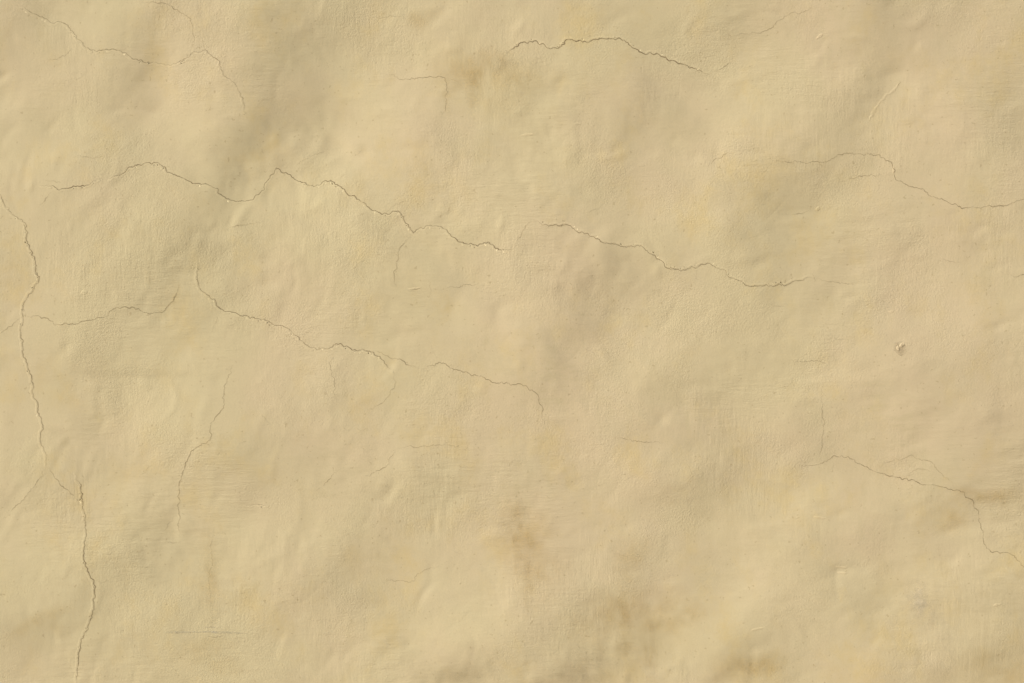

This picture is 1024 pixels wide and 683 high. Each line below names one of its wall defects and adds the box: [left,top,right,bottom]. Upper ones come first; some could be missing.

crack [505,35,710,75]
crack [39,162,514,253]
crack [534,218,814,287]
crack [0,195,46,467]
crack [194,262,393,374]
crack [73,472,96,683]